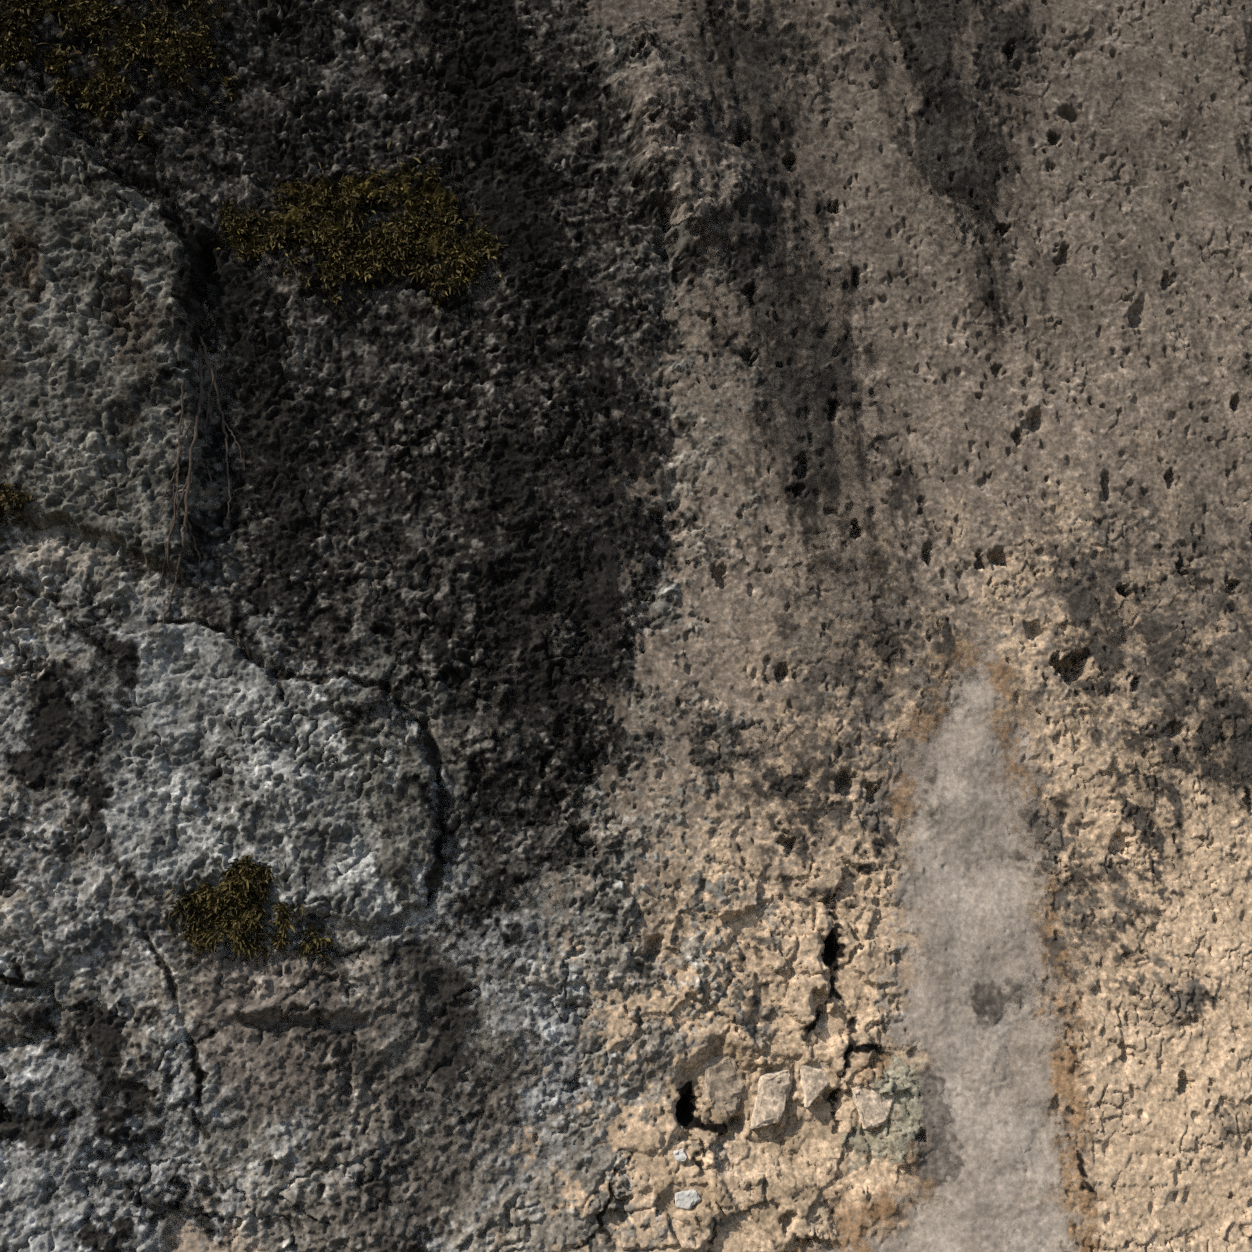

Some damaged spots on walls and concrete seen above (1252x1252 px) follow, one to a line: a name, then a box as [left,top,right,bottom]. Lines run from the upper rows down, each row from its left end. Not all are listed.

water stain [873,0,1049,347]
water stain [1233,6,1252,78]
water stain [1236,119,1252,173]
water stain [0,0,976,1252]
crack [155,618,445,906]
water stain [971,476,1252,1027]
crack [0,957,55,989]
crack [143,929,215,1138]
spalling [821,922,845,973]
crack [801,888,892,1134]
crack [574,1152,633,1250]
spalling [654,1035,964,1249]